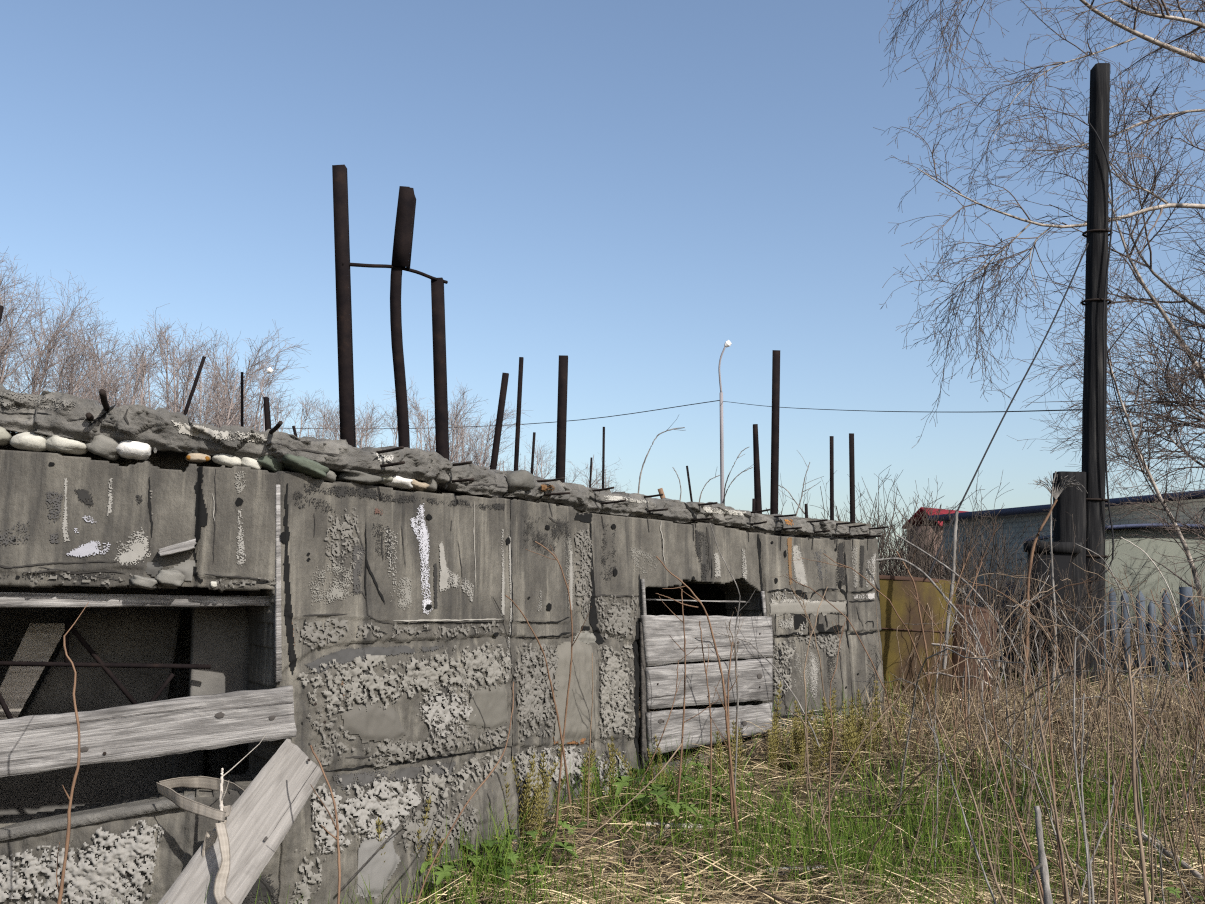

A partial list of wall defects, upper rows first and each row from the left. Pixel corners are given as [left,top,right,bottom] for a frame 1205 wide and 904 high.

water stain [293,483,505,615]
spalling [290,529,638,904]
spalling [0,820,165,904]